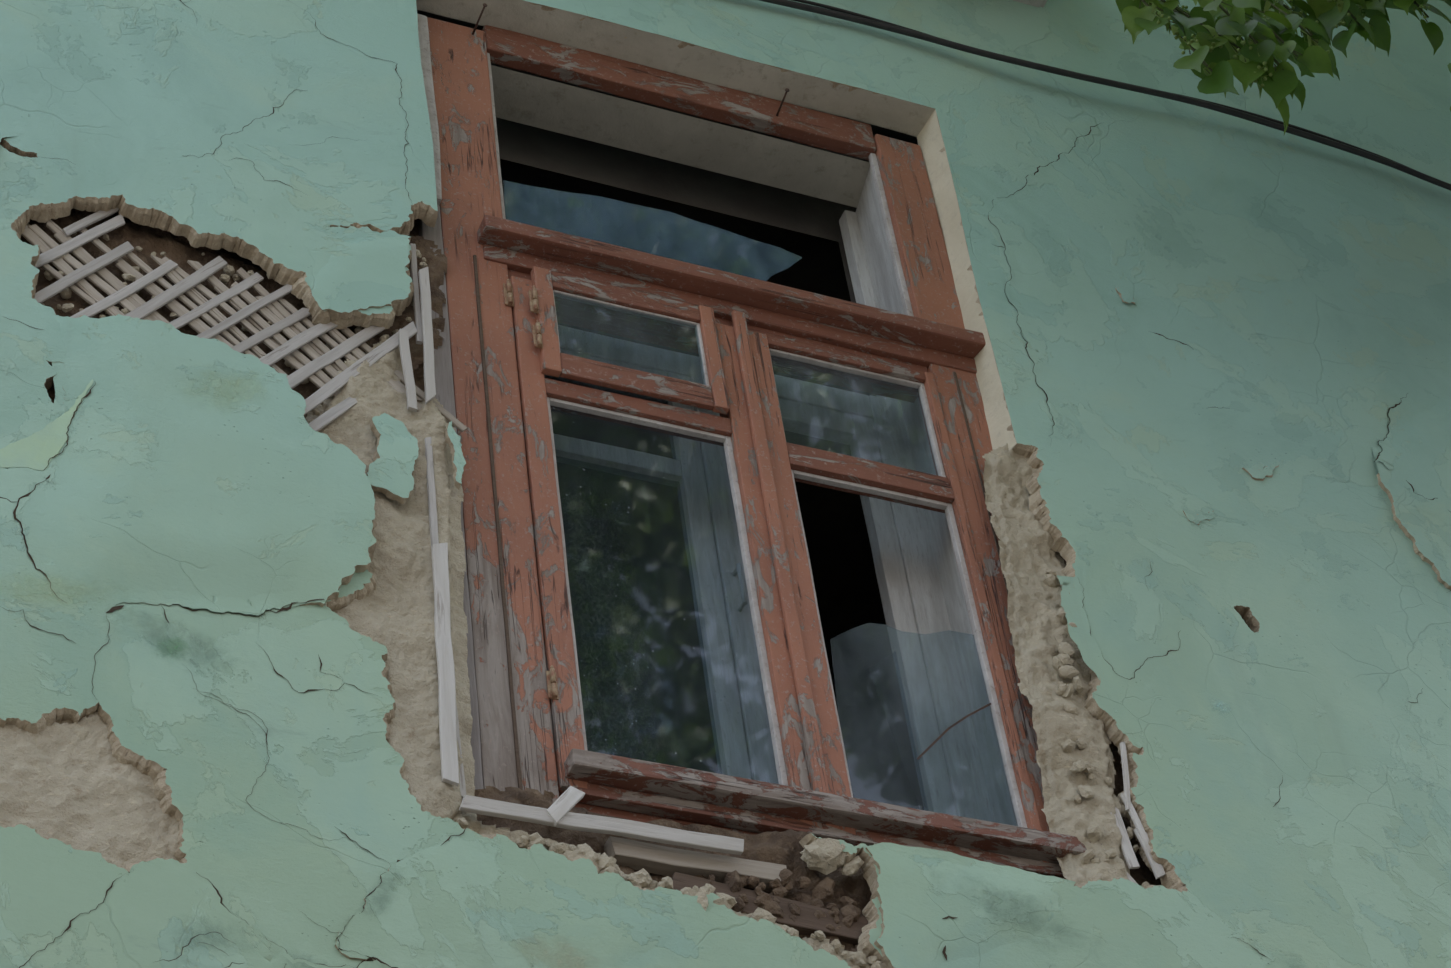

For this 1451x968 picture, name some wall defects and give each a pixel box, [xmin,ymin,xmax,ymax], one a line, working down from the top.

crack [0,474,371,698]
flaking render [0,208,888,968]
flaking render [982,443,1166,888]